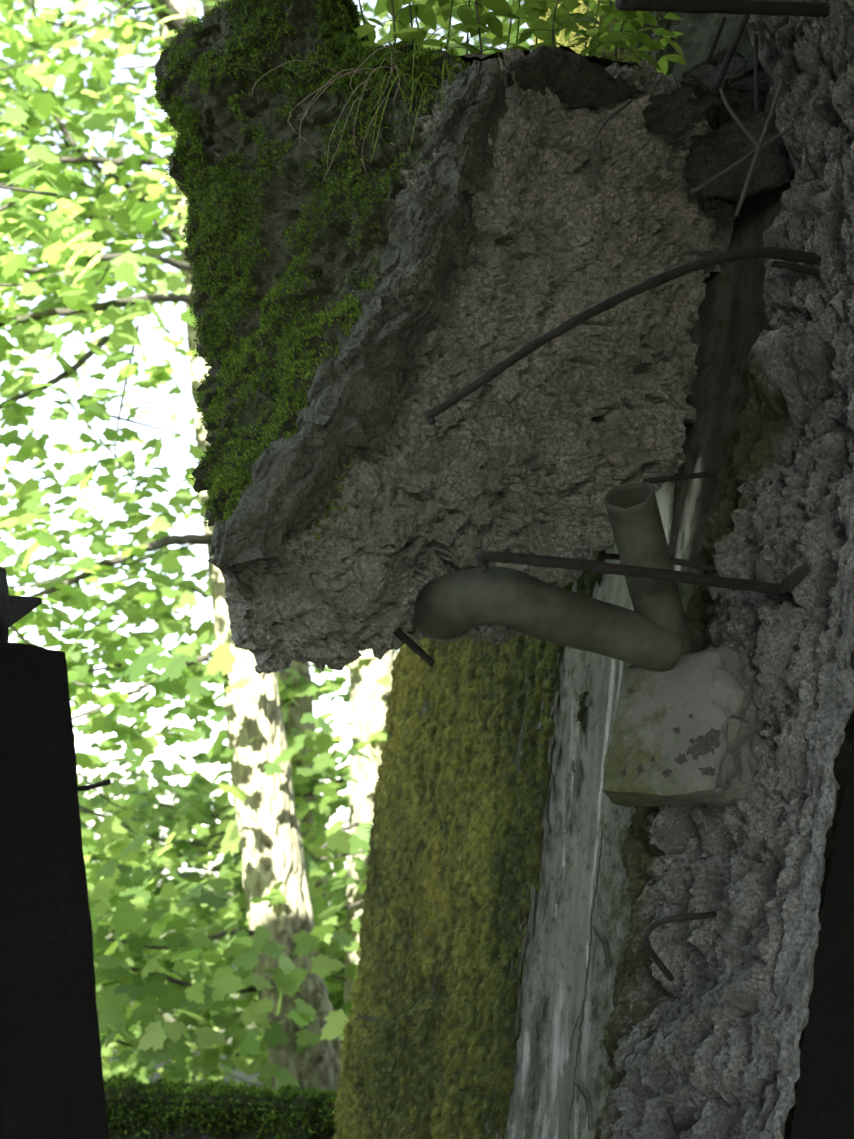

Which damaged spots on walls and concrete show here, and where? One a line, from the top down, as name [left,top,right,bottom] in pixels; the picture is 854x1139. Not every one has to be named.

spalling [208,59,508,578]
spalling [393,628,435,666]
spalling [427,0,854,1139]